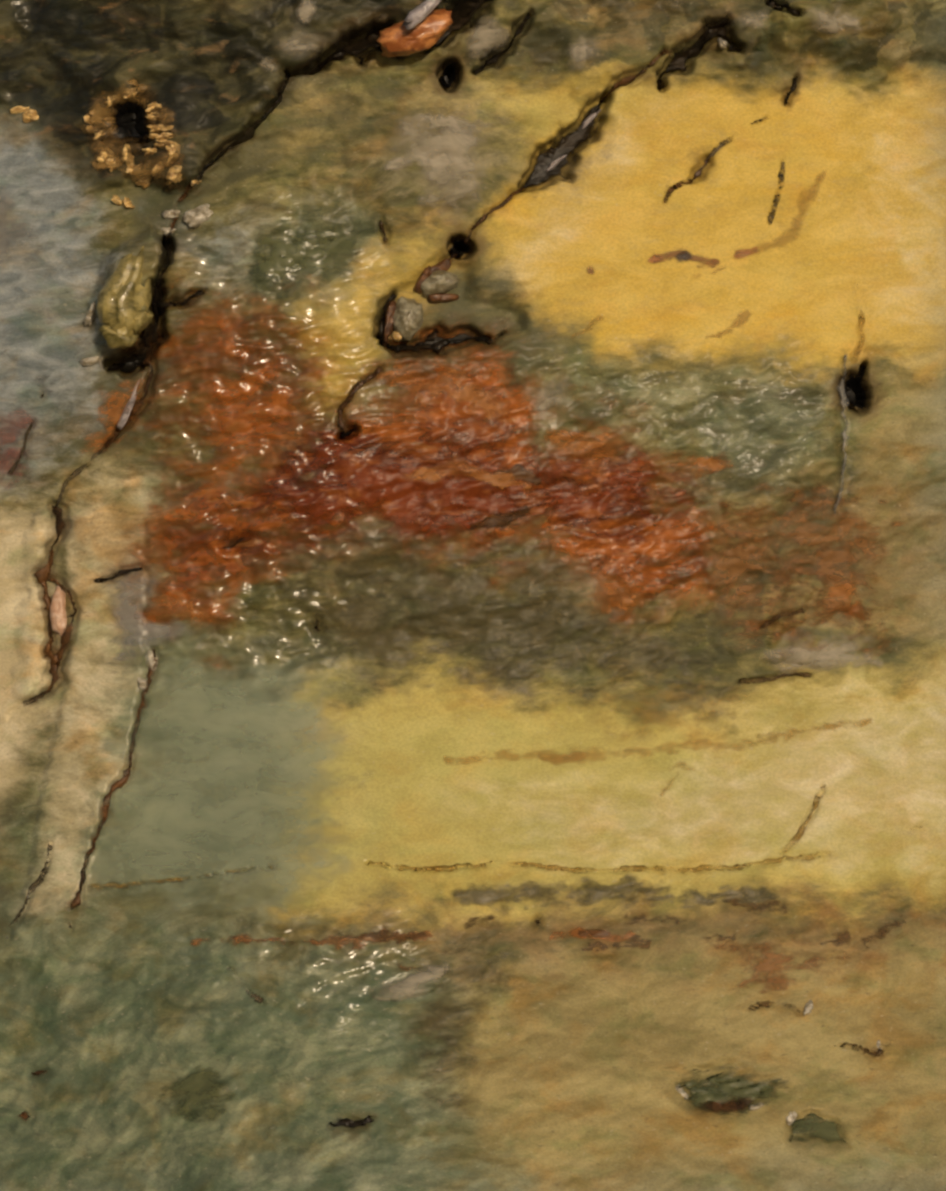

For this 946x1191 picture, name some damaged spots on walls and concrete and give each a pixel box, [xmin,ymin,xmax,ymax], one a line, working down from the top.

damp [298,1,314,22]
damp [470,21,505,53]
damp [818,12,858,33]
peeling [83,79,202,193]
crack [440,13,741,266]
peeling [161,203,213,236]
crack [23,25,391,705]
crack [338,293,503,434]
rust [133,311,885,656]
crack [69,649,157,928]
damp [99,657,327,908]
peeling [703,1099,764,1112]